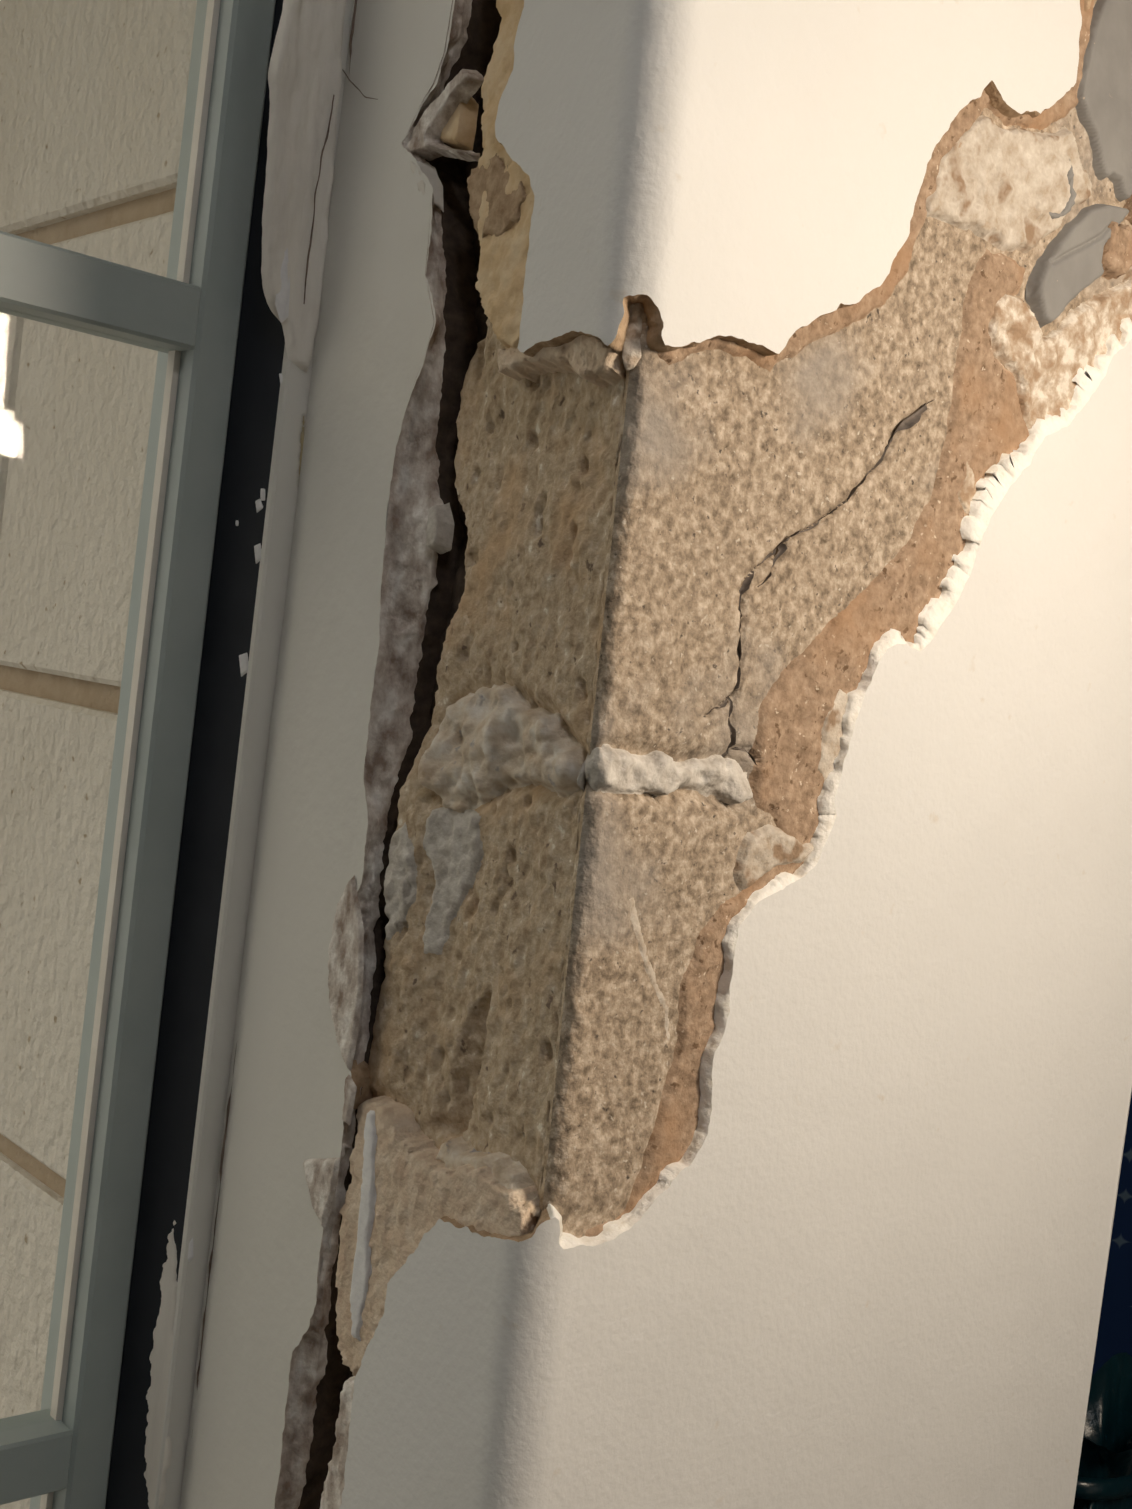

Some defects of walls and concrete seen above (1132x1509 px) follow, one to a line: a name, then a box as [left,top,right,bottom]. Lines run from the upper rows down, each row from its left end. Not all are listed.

peeling [261,0,346,372]
crack [275,0,502,1509]
flaking render [320,0,1132,1509]
crack [706,399,935,765]
crack [197,1044,237,1388]